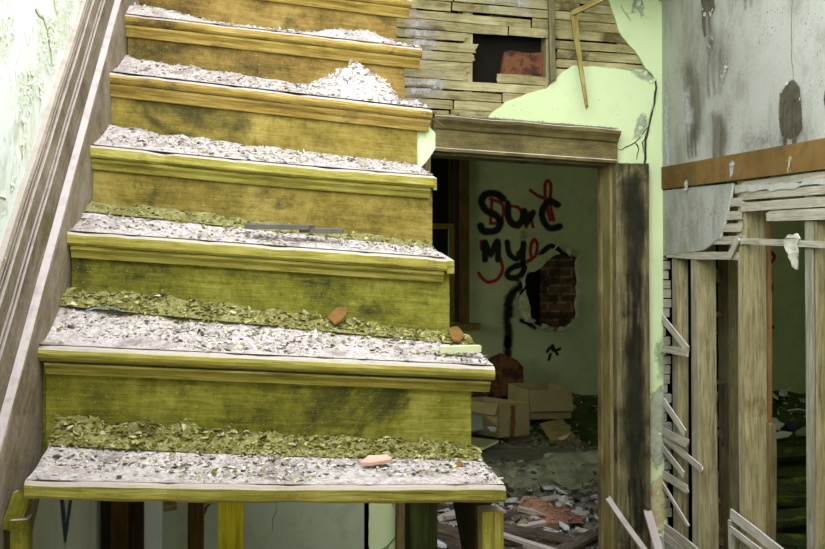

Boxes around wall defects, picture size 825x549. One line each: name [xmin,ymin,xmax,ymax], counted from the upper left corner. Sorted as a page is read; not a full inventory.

spalling [632,0,645,19]
damp [701,0,724,67]
peeling [18,0,82,157]
crack [618,80,659,163]
damp [779,80,802,145]
spalling [739,156,825,192]
spalling [516,243,582,332]